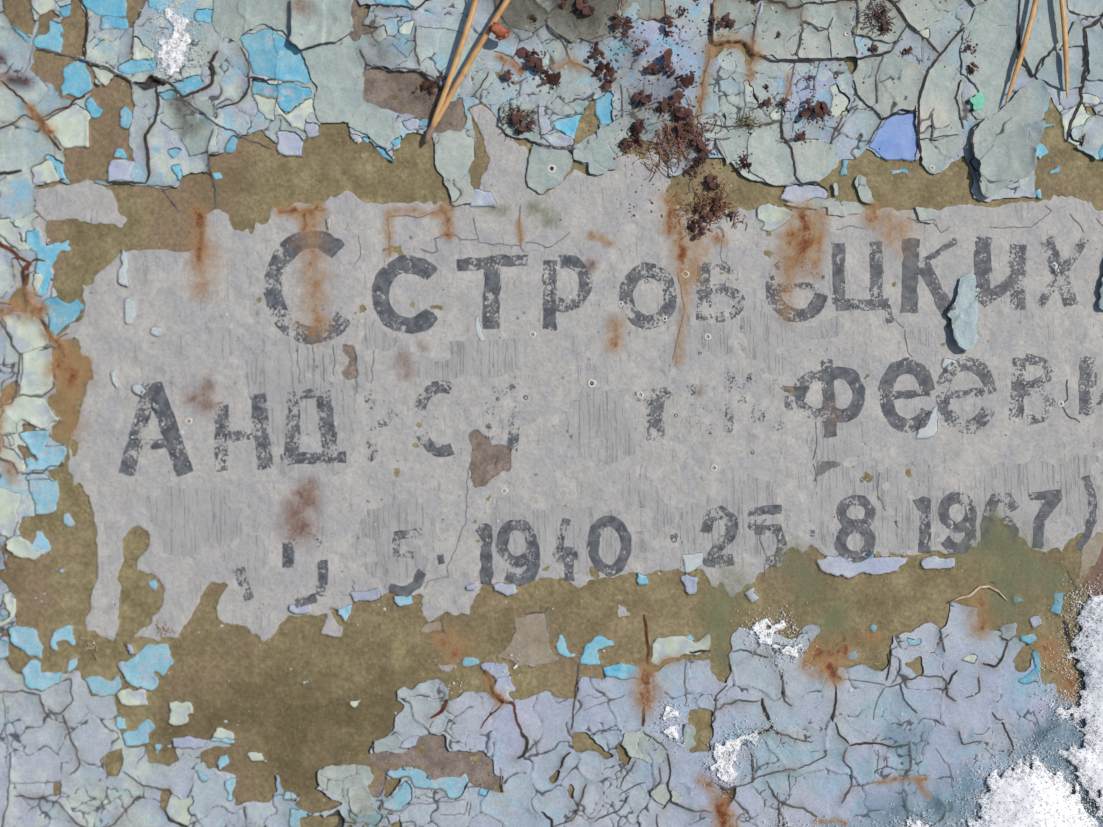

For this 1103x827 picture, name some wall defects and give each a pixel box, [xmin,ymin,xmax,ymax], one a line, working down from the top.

peeling [3,0,135,228]
crack [0,0,276,211]
peeling [194,0,442,148]
peeling [493,91,668,195]
crack [700,0,987,192]
peeling [664,0,1103,231]
crack [1067,12,1103,146]
corrosion [191,205,207,290]
corrosion [663,197,700,310]
corrosion [784,203,824,291]
crack [542,628,1061,827]
corrosion [698,778,736,827]